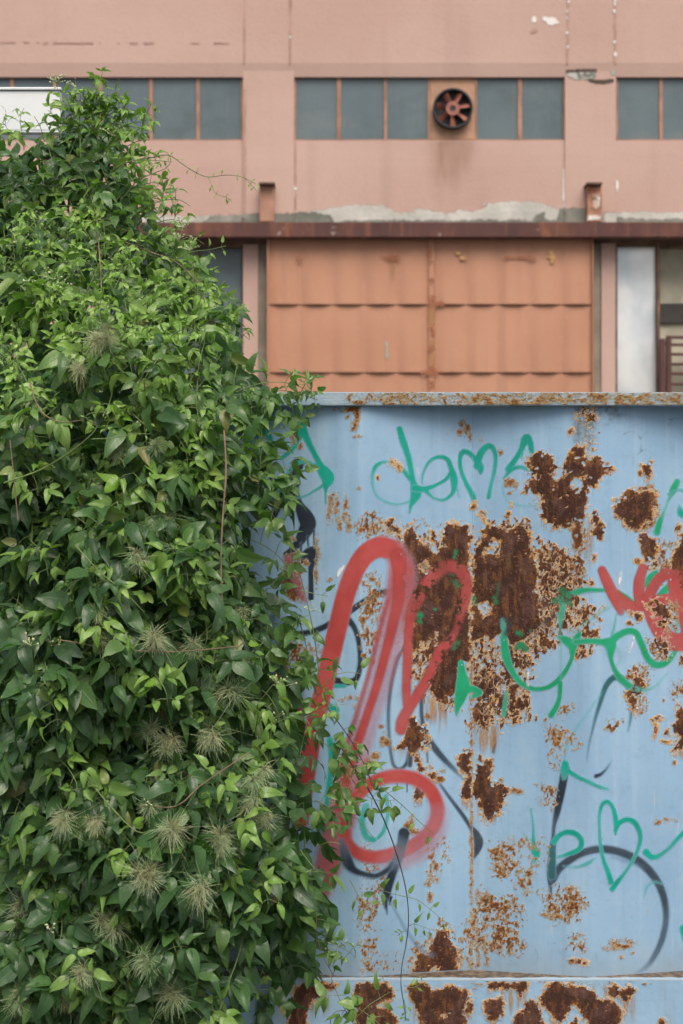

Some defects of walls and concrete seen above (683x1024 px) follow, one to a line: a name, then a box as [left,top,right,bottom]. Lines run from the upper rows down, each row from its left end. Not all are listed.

peeling [530,16,559,34]
flaking render [294,169,565,222]
rust [334,278,683,441]
rust [327,426,683,1024]
rust [286,981,340,1024]